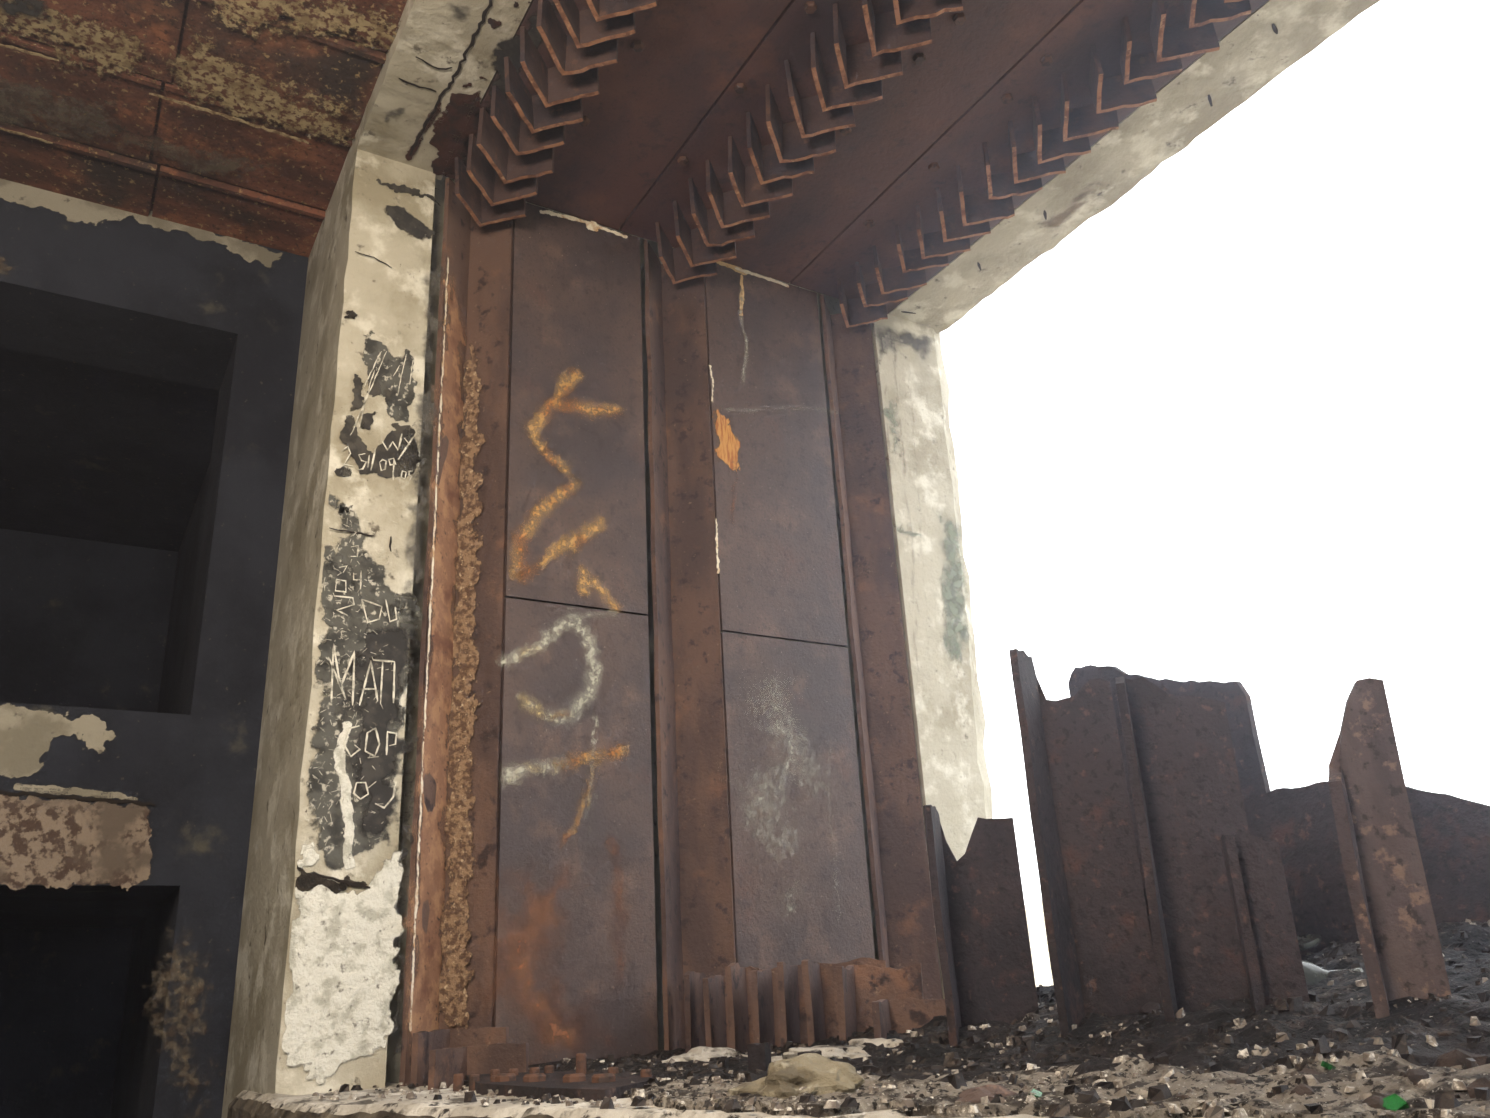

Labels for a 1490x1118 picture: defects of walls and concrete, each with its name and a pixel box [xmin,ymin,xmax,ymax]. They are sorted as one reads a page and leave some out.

crack [399,0,492,161]
peeling [0,178,283,268]
rust [405,279,486,1038]
peeling [0,703,153,891]
peeling [282,721,404,1085]